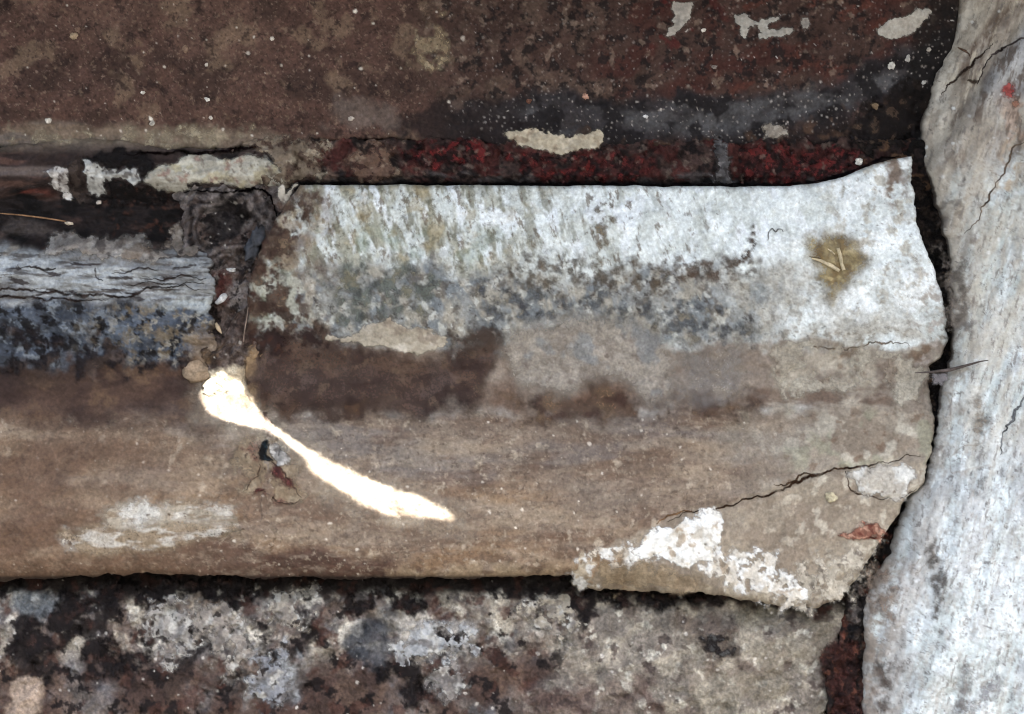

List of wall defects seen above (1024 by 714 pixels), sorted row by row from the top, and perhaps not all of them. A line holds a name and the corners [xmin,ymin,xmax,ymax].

crack [941,37,1024,95]
crack [964,142,1024,234]
leakage [244,197,761,422]
crack [657,454,920,524]
spalling [515,507,867,648]
corrosion [811,639,863,714]